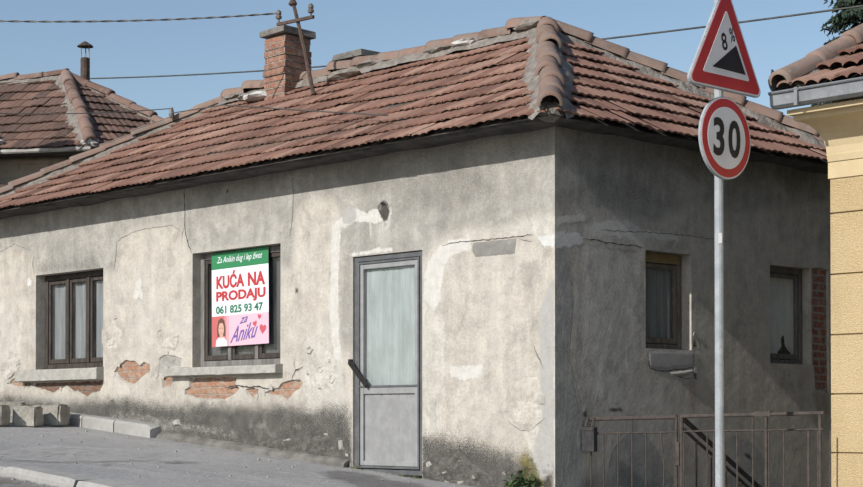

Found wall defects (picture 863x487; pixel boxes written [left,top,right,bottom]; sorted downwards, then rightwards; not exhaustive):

spalling [377,200,390,222]
crack [114,194,191,266]
crack [442,234,529,246]
crack [582,229,728,254]
spalling [0,357,103,397]
spalling [114,351,181,388]
spalling [184,375,303,405]
damp [0,388,554,487]